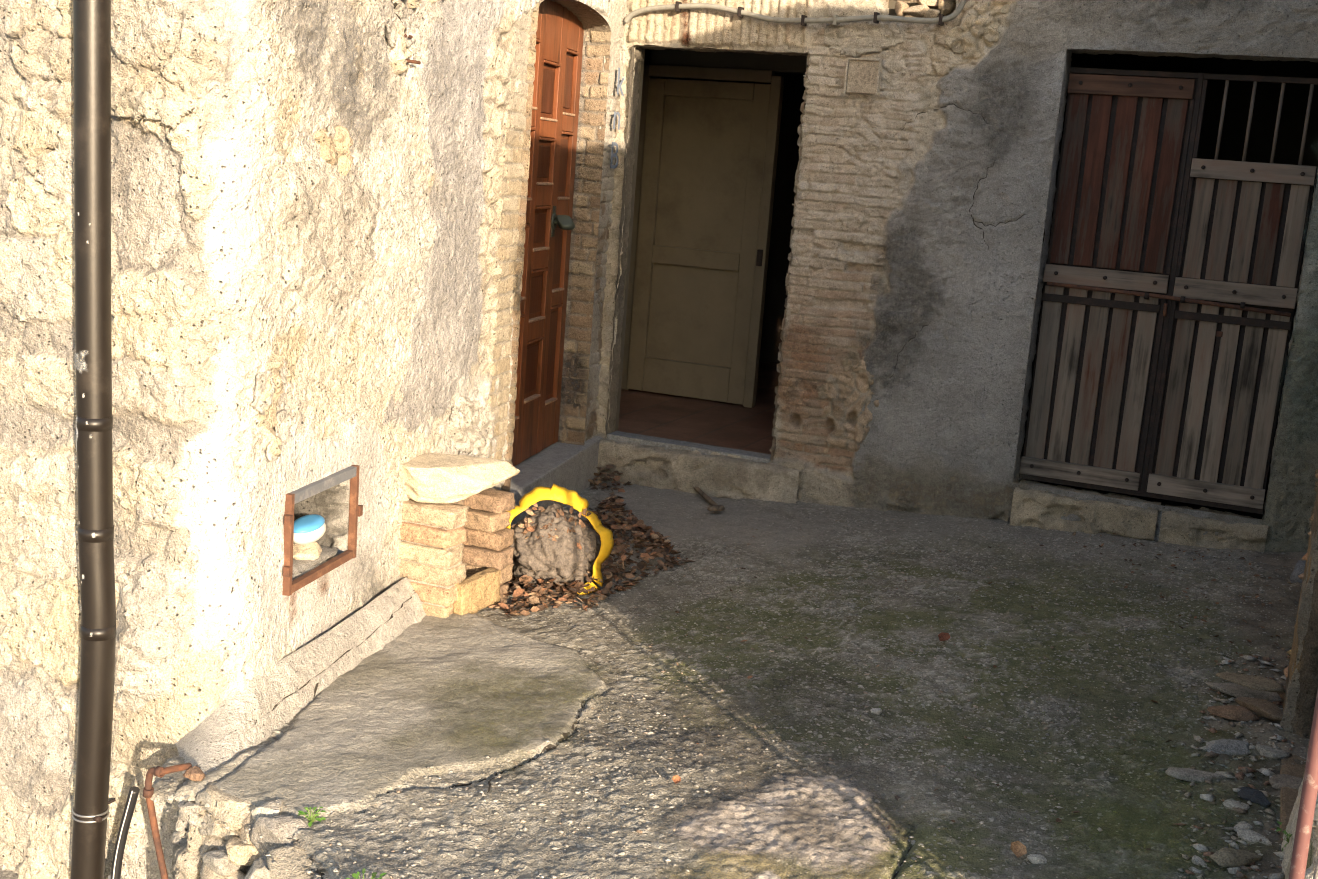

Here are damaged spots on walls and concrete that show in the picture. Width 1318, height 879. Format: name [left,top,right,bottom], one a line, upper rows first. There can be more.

flaking render [816,348,880,453]
crack [449,701,586,793]